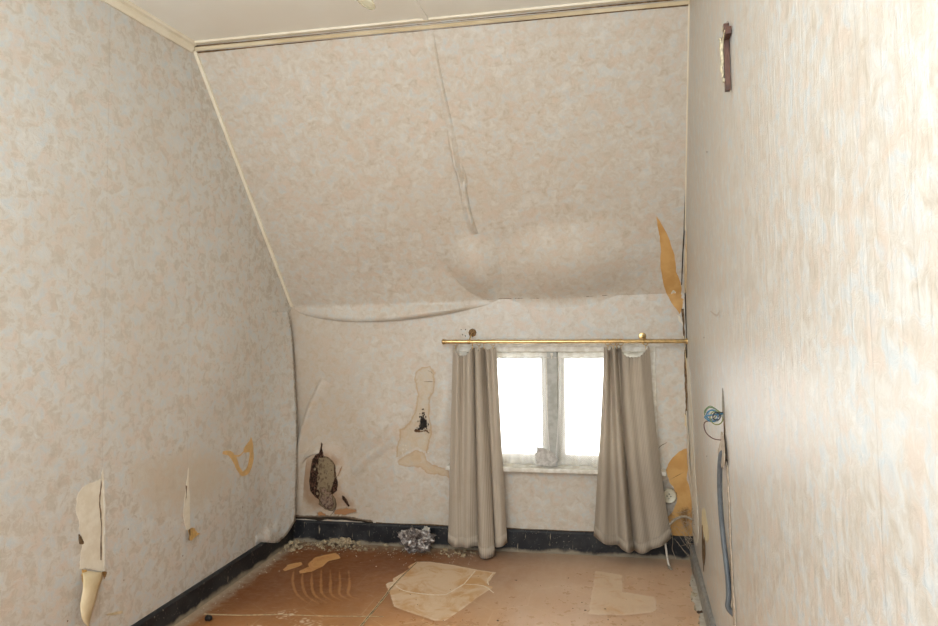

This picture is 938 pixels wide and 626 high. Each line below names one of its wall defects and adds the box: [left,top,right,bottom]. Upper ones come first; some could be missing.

peeling [656,216,684,325]
spalling [300,441,365,517]
peeling [663,448,709,572]